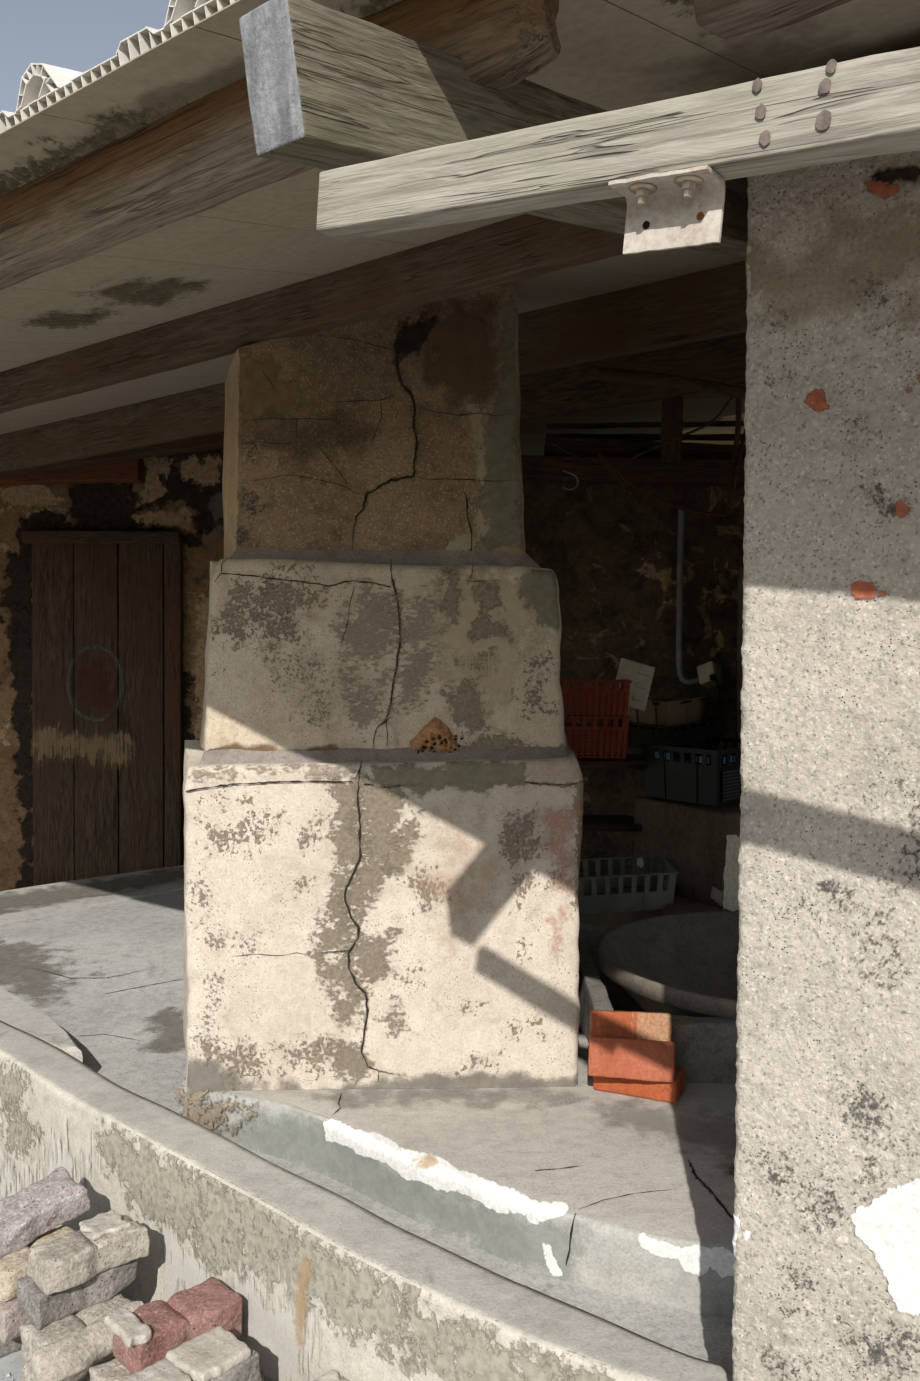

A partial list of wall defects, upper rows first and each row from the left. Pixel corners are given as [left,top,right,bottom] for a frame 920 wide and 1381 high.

leakage [23,277,210,329]
peeling [0,485,74,554]
peeling [131,454,223,535]
crack [185,317,515,1081]
crack [525,780,579,788]
leakage [188,743,584,1106]
leakage [147,1007,252,1095]
flaking render [95,1118,613,1381]
leakage [198,1115,575,1280]
crack [566,1160,734,1265]
peeling [638,1233,734,1279]
leakage [604,1063,918,1244]